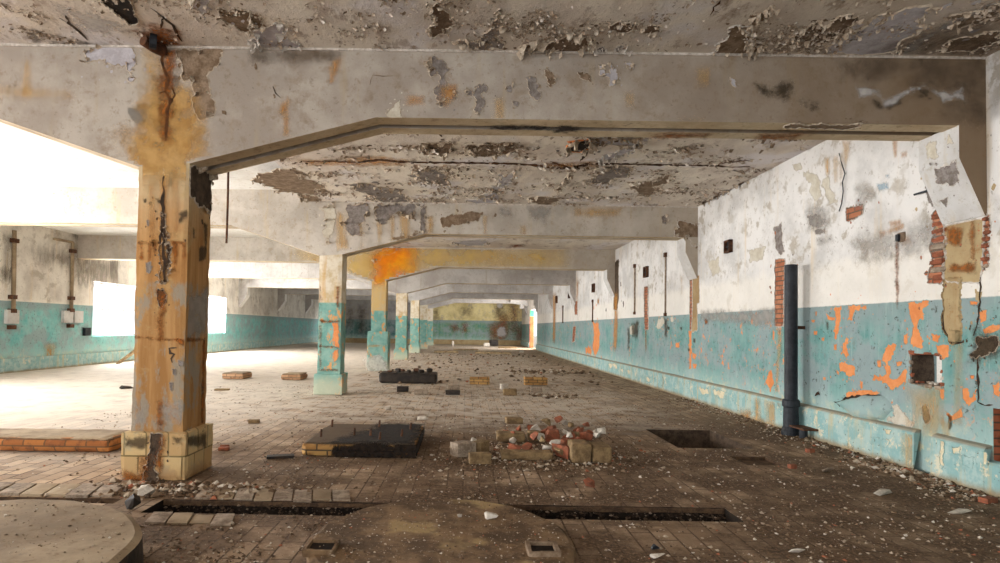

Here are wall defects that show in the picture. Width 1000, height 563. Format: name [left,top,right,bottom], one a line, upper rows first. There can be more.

crack [151,8,183,141]
peeling [0,0,1000,121]
crack [159,176,170,282]
crack [292,152,750,169]
peeling [278,118,879,267]
flaking render [747,222,798,340]
spalling [811,134,1000,448]
crack [941,277,992,406]
spalling [140,432,169,482]